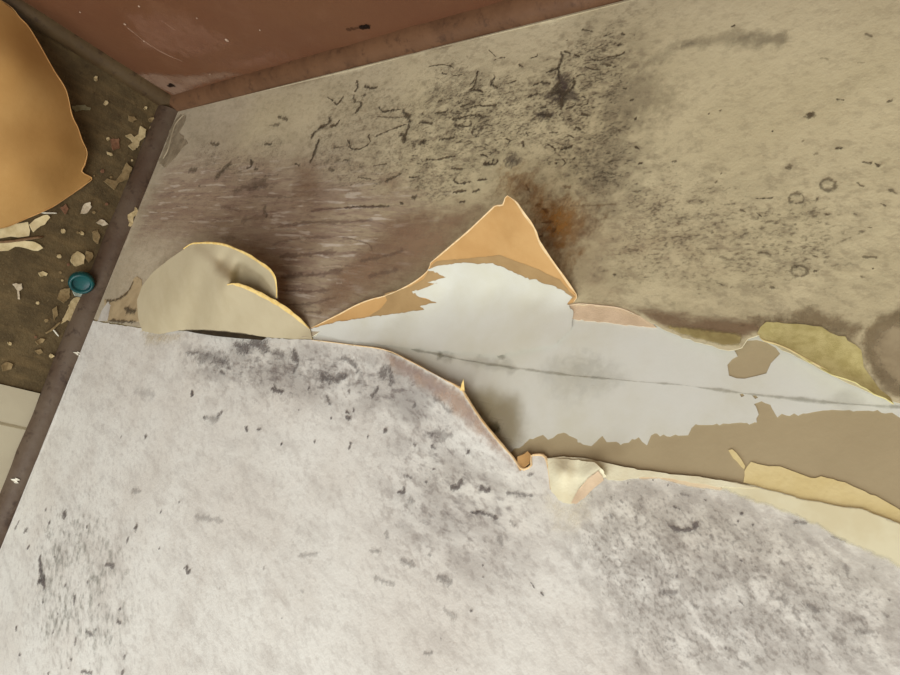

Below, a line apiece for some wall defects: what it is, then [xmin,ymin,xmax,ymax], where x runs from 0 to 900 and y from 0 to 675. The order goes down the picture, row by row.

water stain [347,29,642,187]
water stain [426,156,487,203]
water stain [321,215,464,305]
water stain [252,350,298,394]
water stain [308,366,346,405]